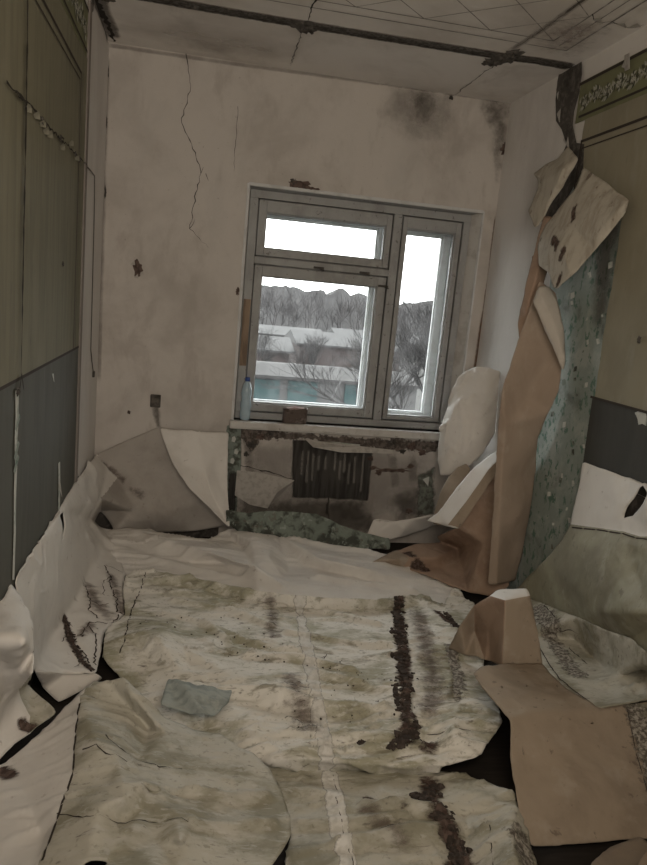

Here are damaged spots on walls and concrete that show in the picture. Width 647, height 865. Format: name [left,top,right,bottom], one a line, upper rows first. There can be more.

crack [95,0,118,42]
crack [140,0,573,95]
crack [181,54,208,247]
spalling [226,179,485,515]
peeling [506,218,622,589]